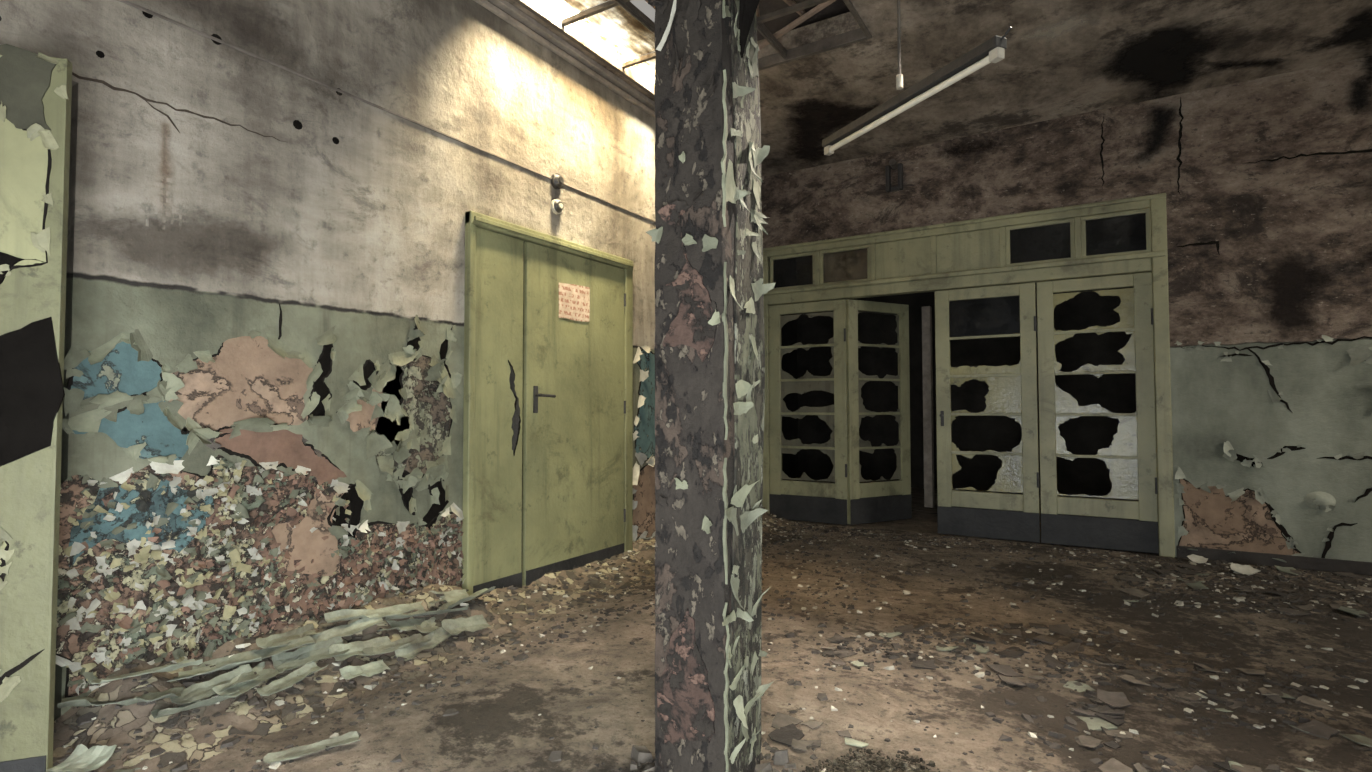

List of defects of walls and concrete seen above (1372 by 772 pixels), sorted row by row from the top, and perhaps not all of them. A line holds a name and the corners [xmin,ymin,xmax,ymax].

water stain [1209,60,1279,69]
water stain [1348,56,1372,112]
peeling [0,44,69,284]
water stain [1136,108,1176,160]
crack [1248,149,1372,163]
peeling [1175,335,1372,352]
crack [1216,348,1292,412]
peeling [632,345,655,541]
peeling [56,315,465,698]
peeling [674,478,688,490]
spalling [1175,441,1306,563]
crack [1259,445,1372,558]